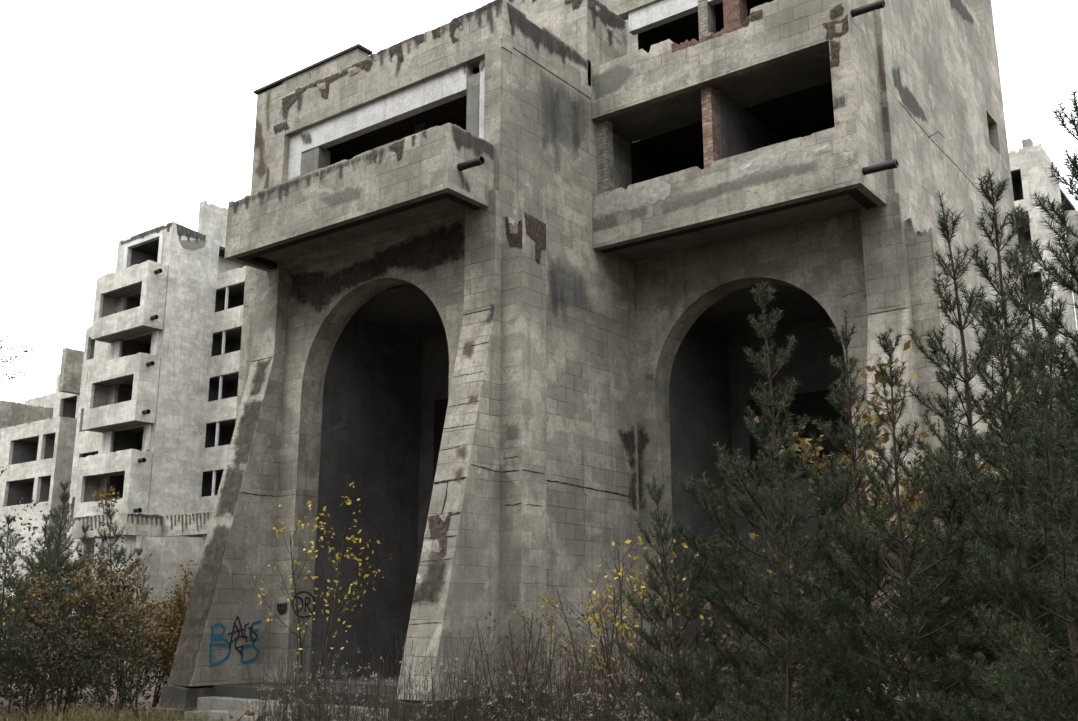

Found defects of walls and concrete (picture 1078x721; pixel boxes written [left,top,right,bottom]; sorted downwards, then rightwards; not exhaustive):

spalling [388,43,404,75]
spalling [417,20,463,44]
leakage [367,0,632,98]
spalling [564,0,600,11]
spalling [823,3,849,67]
leakage [951,0,974,23]
spalling [273,59,373,134]
leakage [892,67,927,121]
spalling [505,213,546,264]
crack [421,401,629,562]
leakage [618,427,649,510]
leakage [127,359,270,685]